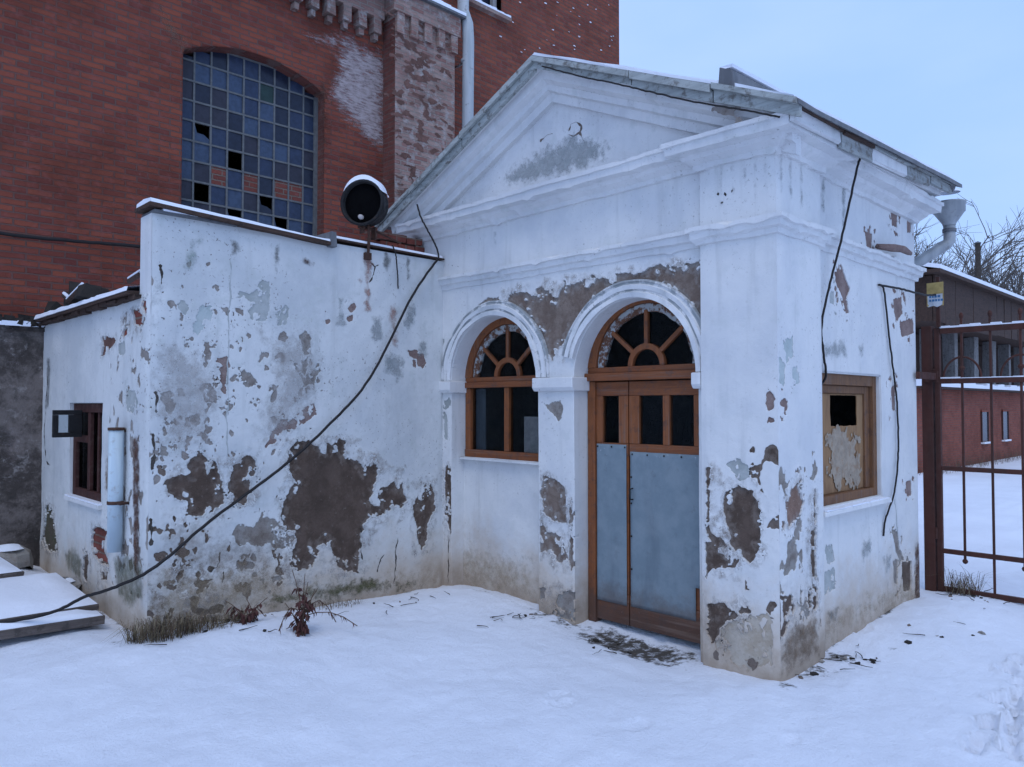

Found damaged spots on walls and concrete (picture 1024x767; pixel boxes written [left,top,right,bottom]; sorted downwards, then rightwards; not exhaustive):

spalling [383,9,454,196]
water stain [508,135,604,180]
peeling [864,226,875,248]
peeling [889,213,913,236]
spalling [480,260,701,361]
spalling [830,260,849,321]
peeling [891,288,914,342]
spalling [83,276,451,618]
spalling [43,505,58,553]
spalling [540,474,575,571]
peeling [706,444,836,672]